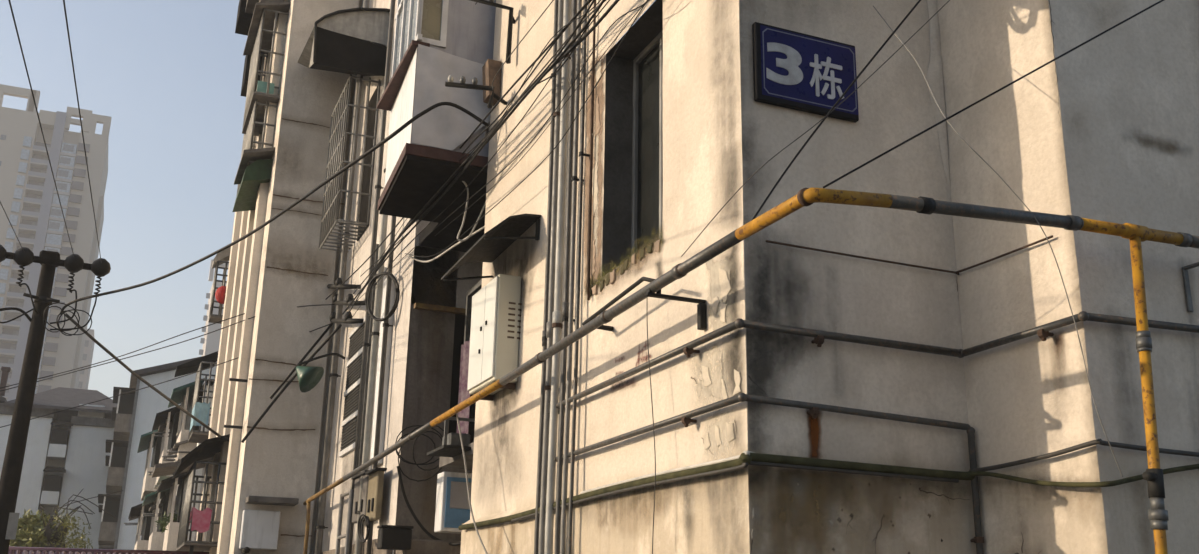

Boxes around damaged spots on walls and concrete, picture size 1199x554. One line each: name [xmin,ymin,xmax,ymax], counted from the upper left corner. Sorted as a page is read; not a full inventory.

peeling [706,258,735,330]
leakage [729,245,799,396]
peeling [691,350,767,455]
corrosion [809,410,820,459]